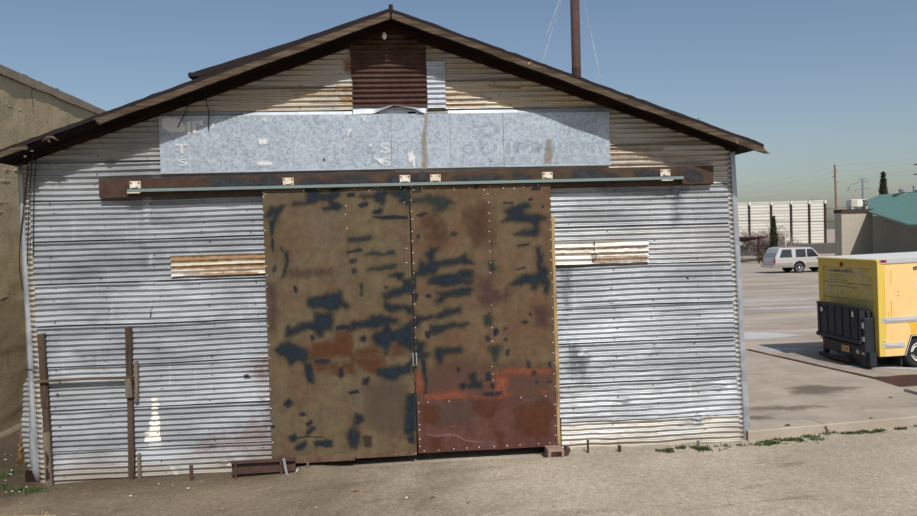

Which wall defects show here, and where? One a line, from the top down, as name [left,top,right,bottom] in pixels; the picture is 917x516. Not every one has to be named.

corrosion [171,254,264,276]
corrosion [557,246,648,263]
corrosion [311,331,381,373]